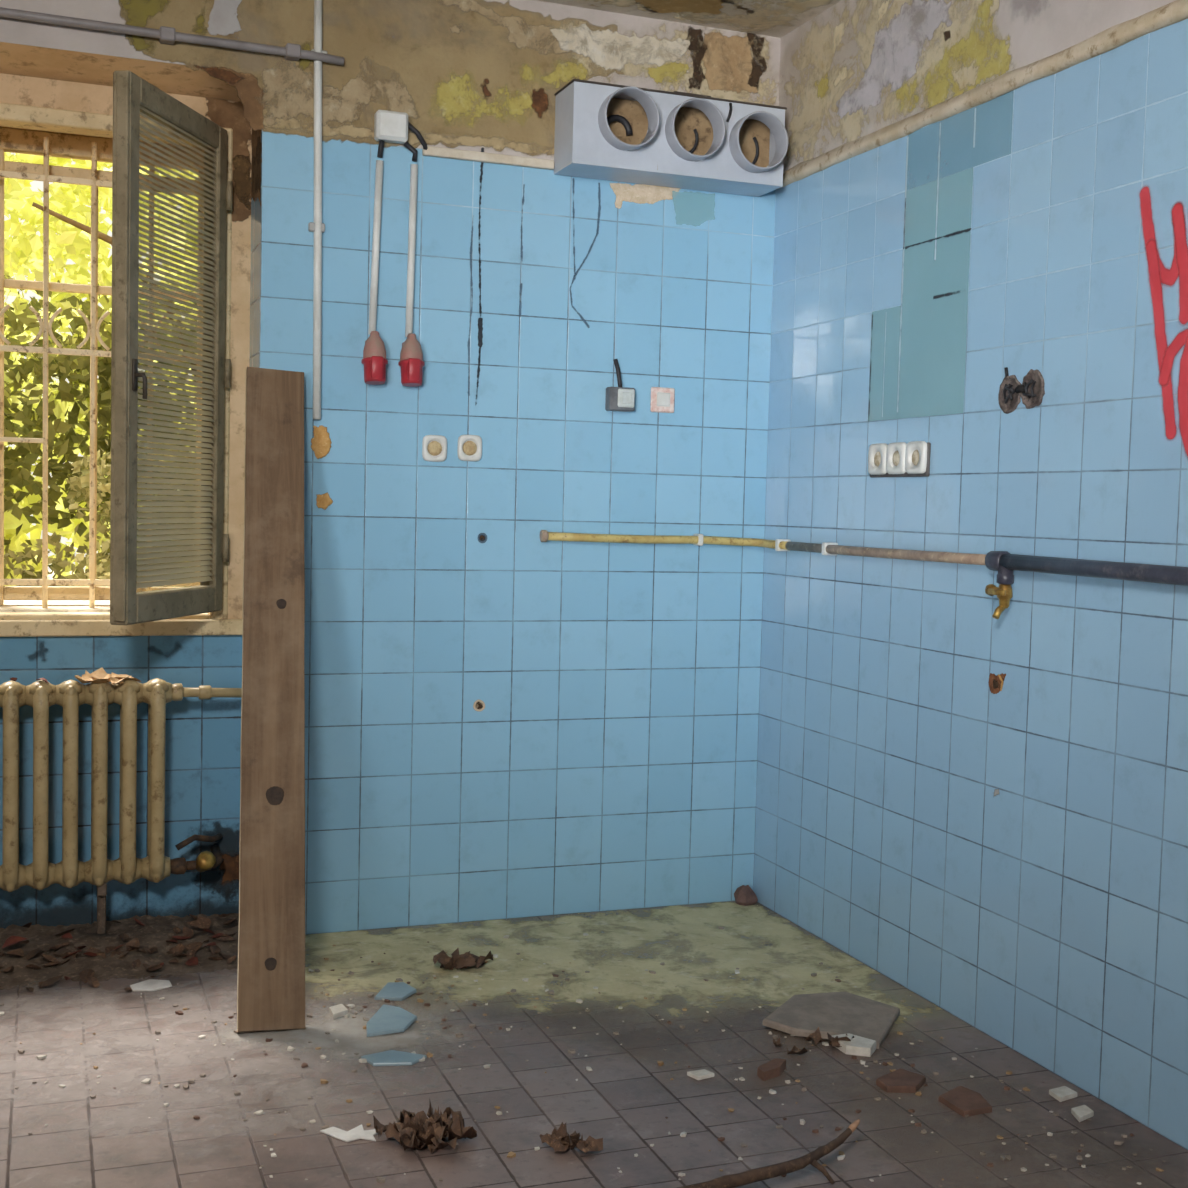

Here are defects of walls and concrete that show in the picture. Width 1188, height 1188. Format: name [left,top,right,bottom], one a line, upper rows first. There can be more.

spalling [635,0,754,14]
peeling [119,0,624,222]
peeling [952,60,979,90]
leakage [305,902,942,1023]